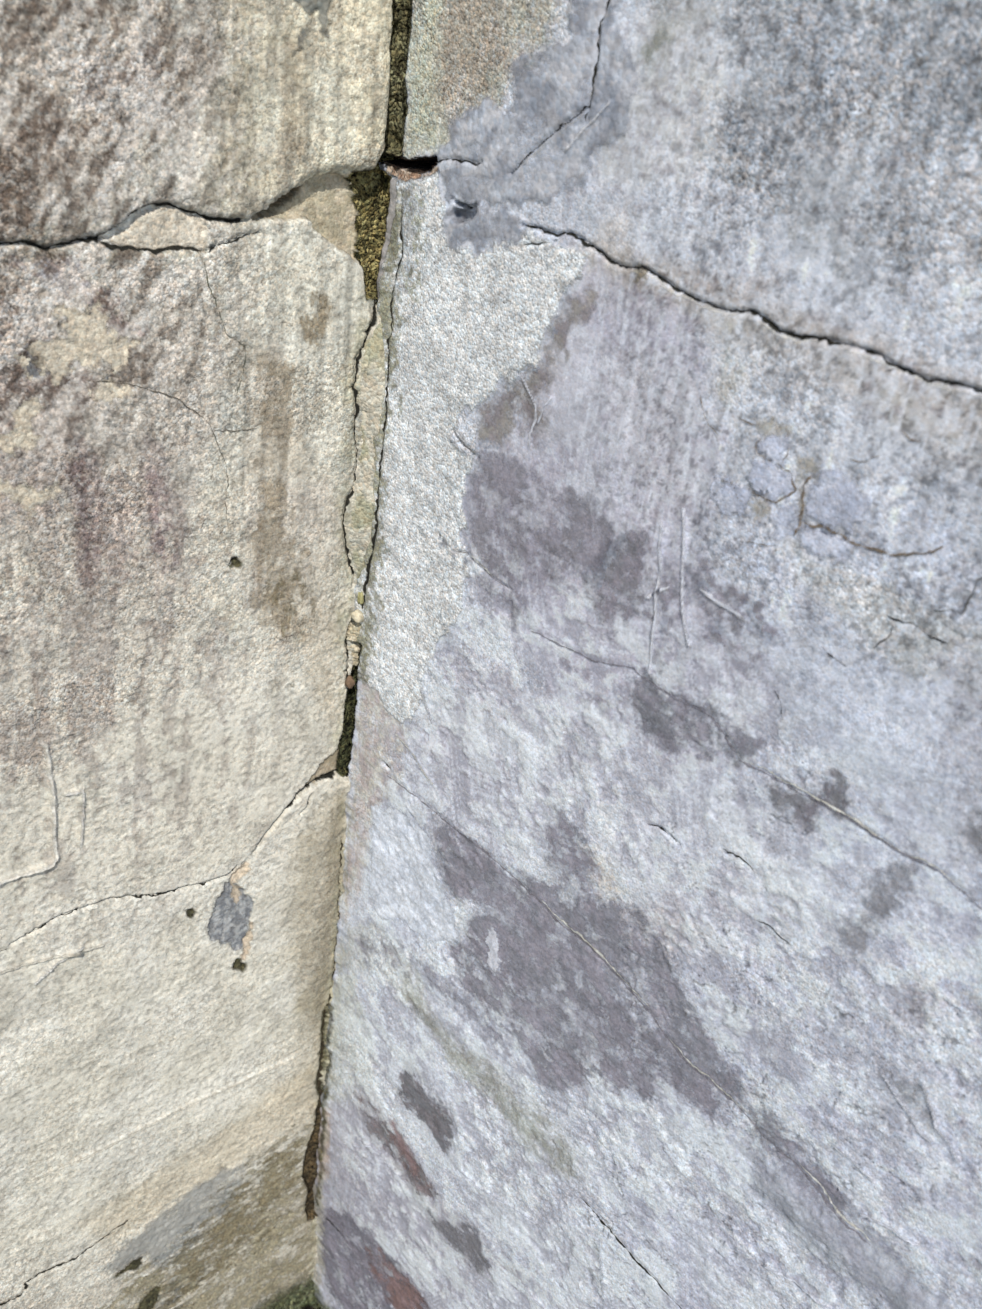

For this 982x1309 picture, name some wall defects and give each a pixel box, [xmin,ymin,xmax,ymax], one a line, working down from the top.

crack [522,225,982,392]
crack [342,200,403,678]
damp [470,291,687,625]
damp [699,560,777,647]
crack [286,770,335,809]
crack [0,1219,130,1306]
crack [1,868,234,951]
damp [99,1124,429,1309]
crack [315,840,345,1241]
damp [358,1097,490,1272]
damp [398,1071,453,1153]
damp [426,812,744,1116]